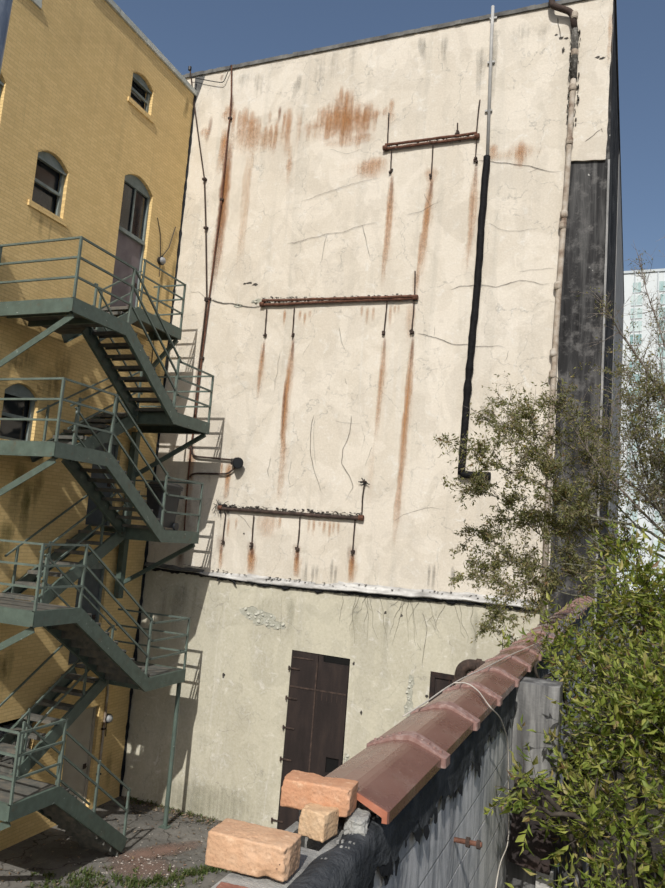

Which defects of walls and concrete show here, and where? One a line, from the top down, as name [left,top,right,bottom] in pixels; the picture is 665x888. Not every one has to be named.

corrosion [217,165,229,238]
corrosion [282,370,290,437]
corrosion [402,378,410,450]